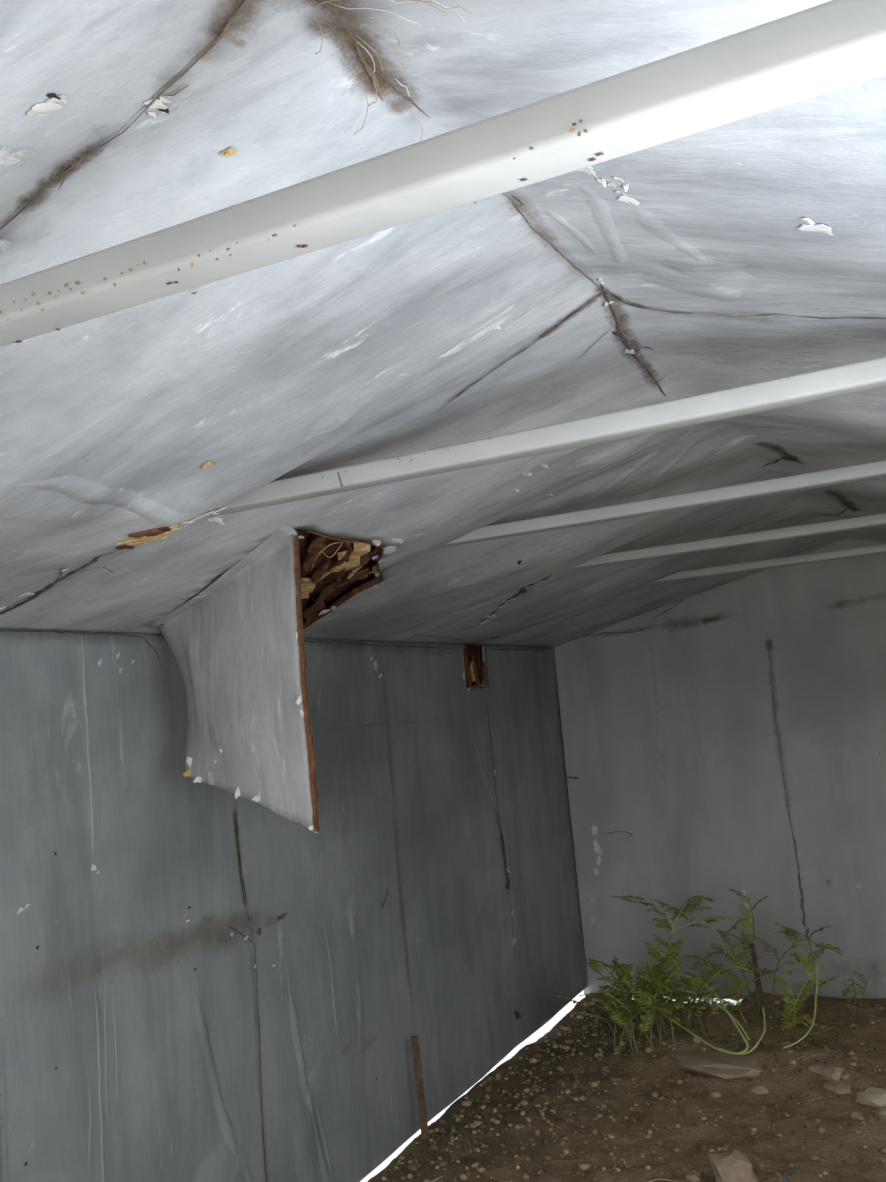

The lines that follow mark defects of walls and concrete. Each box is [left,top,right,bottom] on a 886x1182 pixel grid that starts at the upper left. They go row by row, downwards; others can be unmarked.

crack [0,1,243,230]
damp [313,0,471,140]
crack [437,193,886,413]
crack [0,534,163,671]
spalling [116,507,226,550]
peeling [372,539,404,554]
spalling [463,637,499,691]
peeling [183,756,202,783]
crack [767,632,809,939]